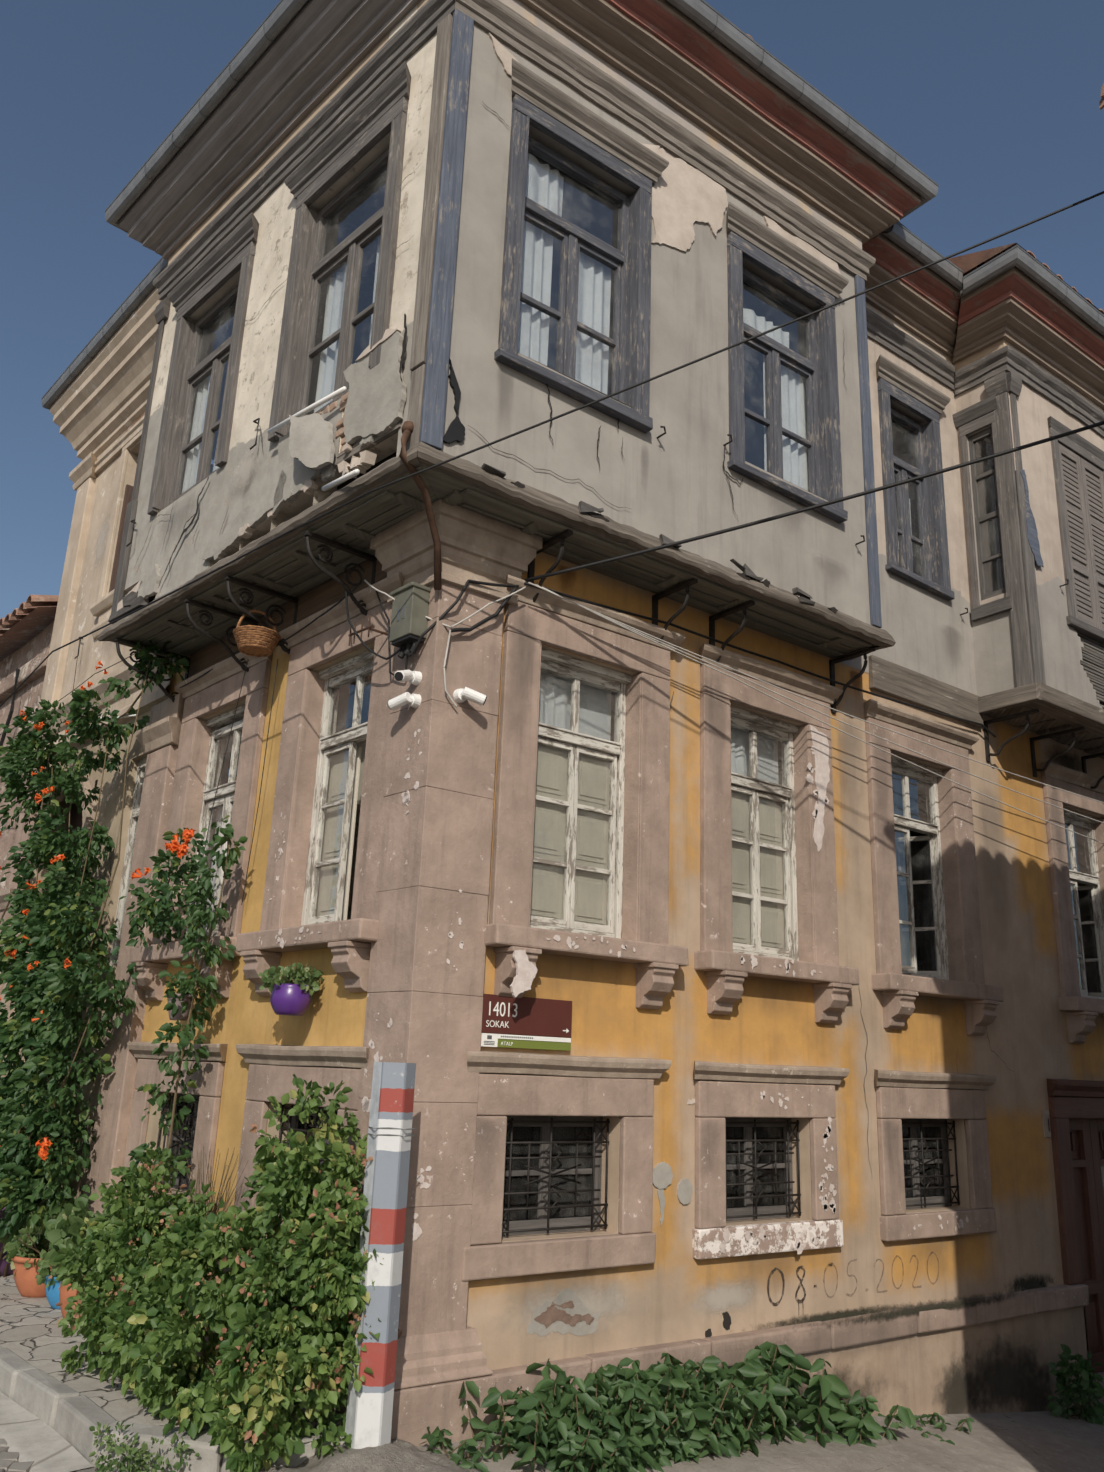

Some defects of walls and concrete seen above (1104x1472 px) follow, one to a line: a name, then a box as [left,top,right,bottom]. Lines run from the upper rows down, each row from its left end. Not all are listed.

flaking render [202,328,407,561]
crack [135,477,228,588]
peeling [760,1090,810,1109]
peeling [819,1117,837,1213]
peeling [719,1225,836,1255]
flaking render [527,1288,601,1337]